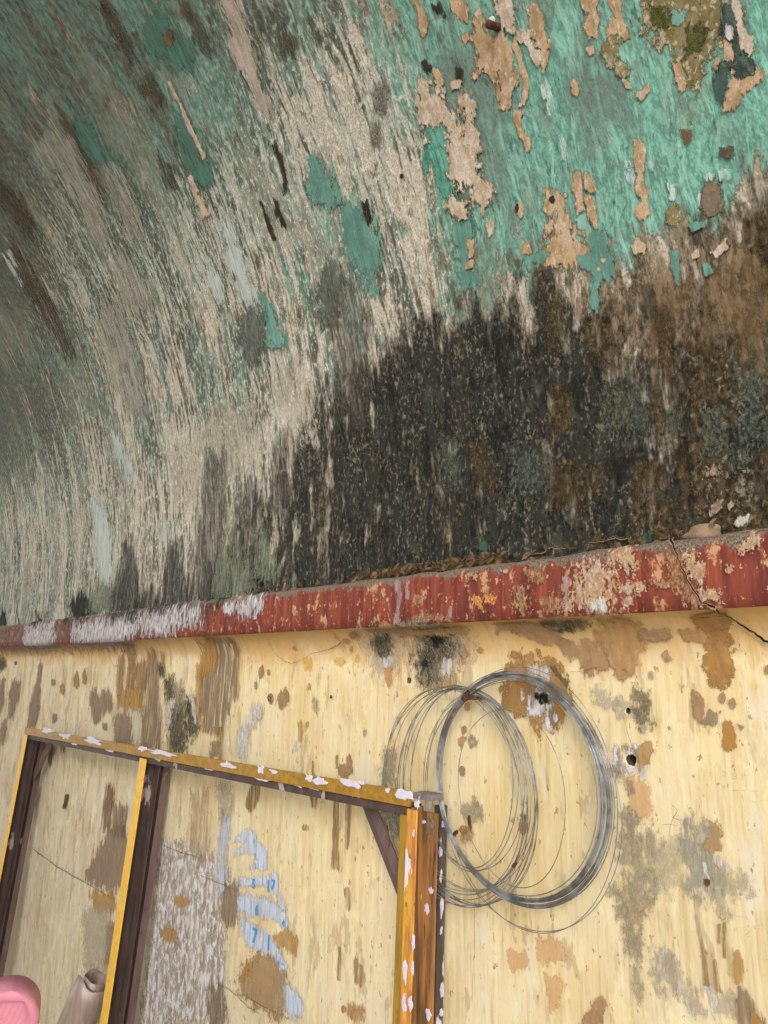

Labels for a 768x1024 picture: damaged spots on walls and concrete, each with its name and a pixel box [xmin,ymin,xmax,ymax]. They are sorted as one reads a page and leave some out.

peeling [579,0,650,101]
peeling [712,0,766,114]
peeling [409,0,552,293]
peeling [633,137,651,222]
peeling [521,170,615,316]
water stain [743,198,768,295]
water stain [0,266,768,759]
flaking render [708,498,764,574]
peeling [472,544,725,742]
crack [667,537,768,644]
flaking render [608,741,654,822]
water stain [631,949,645,1004]